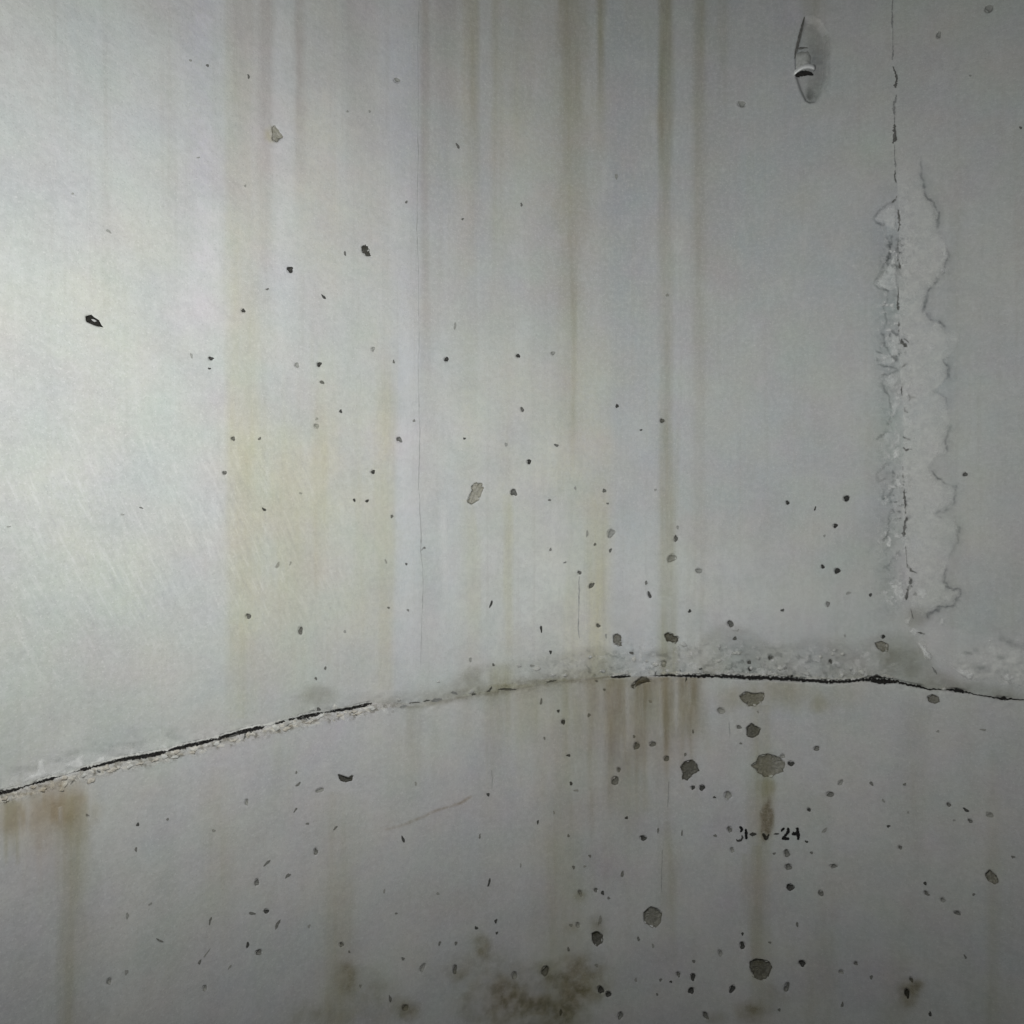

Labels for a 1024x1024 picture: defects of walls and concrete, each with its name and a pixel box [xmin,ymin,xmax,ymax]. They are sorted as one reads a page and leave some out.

crack [891,0,924,634]
leakage [600,644,865,681]
crack [400,686,516,708]
crack [611,667,1024,700]
crack [0,703,372,794]